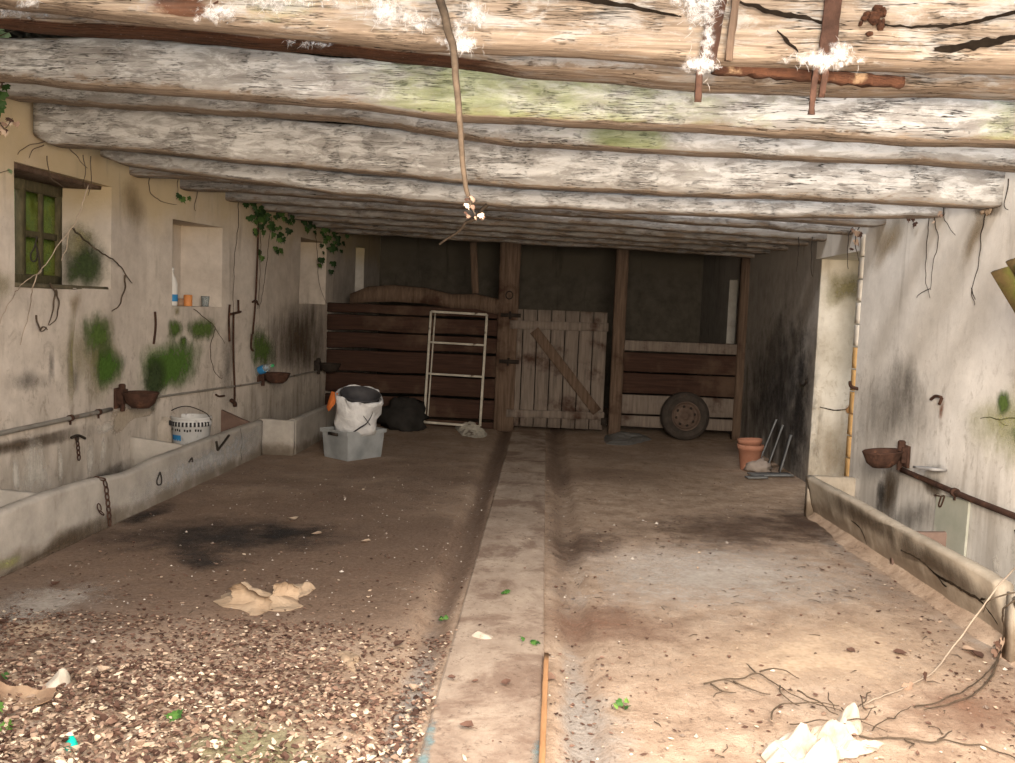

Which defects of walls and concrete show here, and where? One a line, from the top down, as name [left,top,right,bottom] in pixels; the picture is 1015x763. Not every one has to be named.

crack [740,0,822,52]
crack [884,10,1015,53]
damp [146,359,164,392]
crack [901,550,998,625]